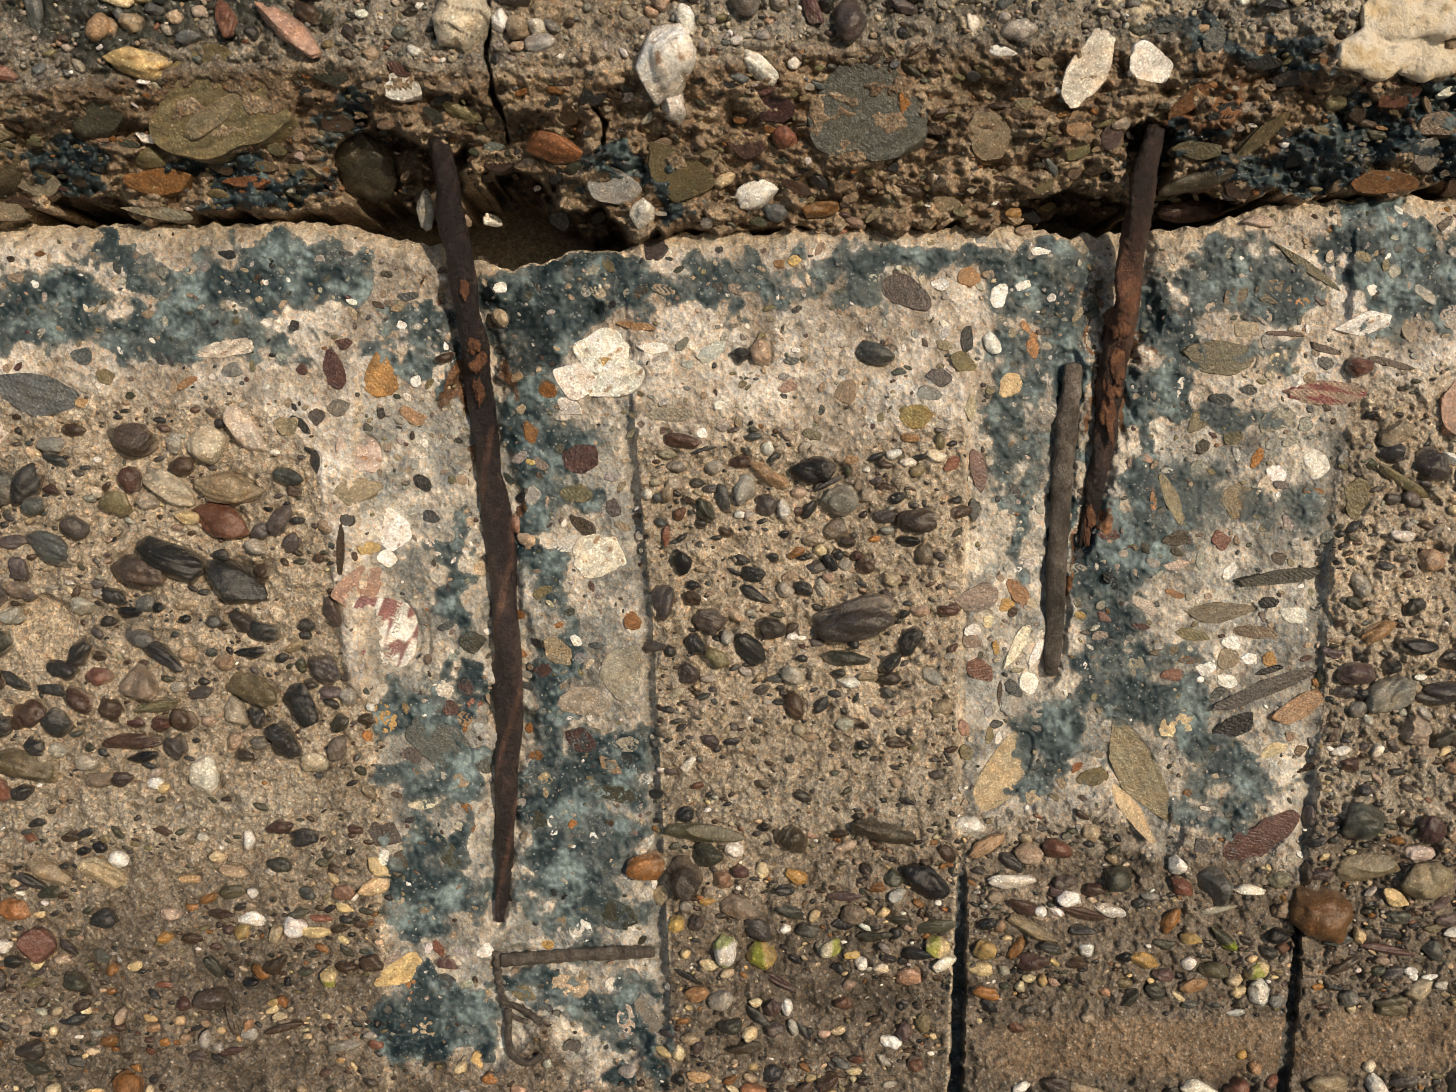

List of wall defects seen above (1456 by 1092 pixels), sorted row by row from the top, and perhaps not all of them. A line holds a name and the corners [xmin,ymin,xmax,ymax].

corrosion [437,268,483,312]
corrosion [437,327,519,415]
corrosion [1082,281,1157,446]
corrosion [467,444,475,485]
corrosion [516,488,528,518]
leakage [367,0,1456,1092]
corrosion [1065,503,1113,596]